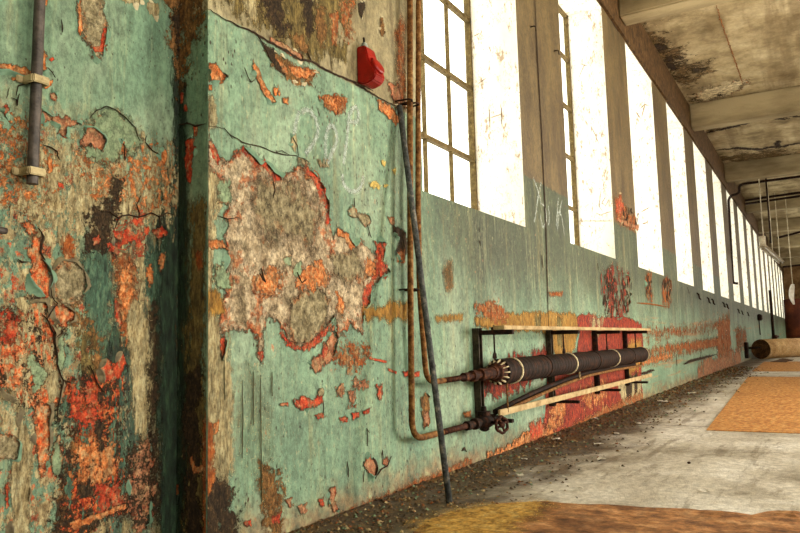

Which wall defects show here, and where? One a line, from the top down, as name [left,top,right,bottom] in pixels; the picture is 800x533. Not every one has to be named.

peeling [75,0,111,64]
peeling [244,37,348,115]
crack [209,9,396,106]
damp [644,23,718,103]
crack [89,106,158,154]
crack [178,122,309,162]
peeling [0,50,198,533]
peeling [208,133,407,375]
peeling [576,263,643,352]
crack [42,288,71,420]
peeling [280,388,328,421]
peeling [484,362,643,436]